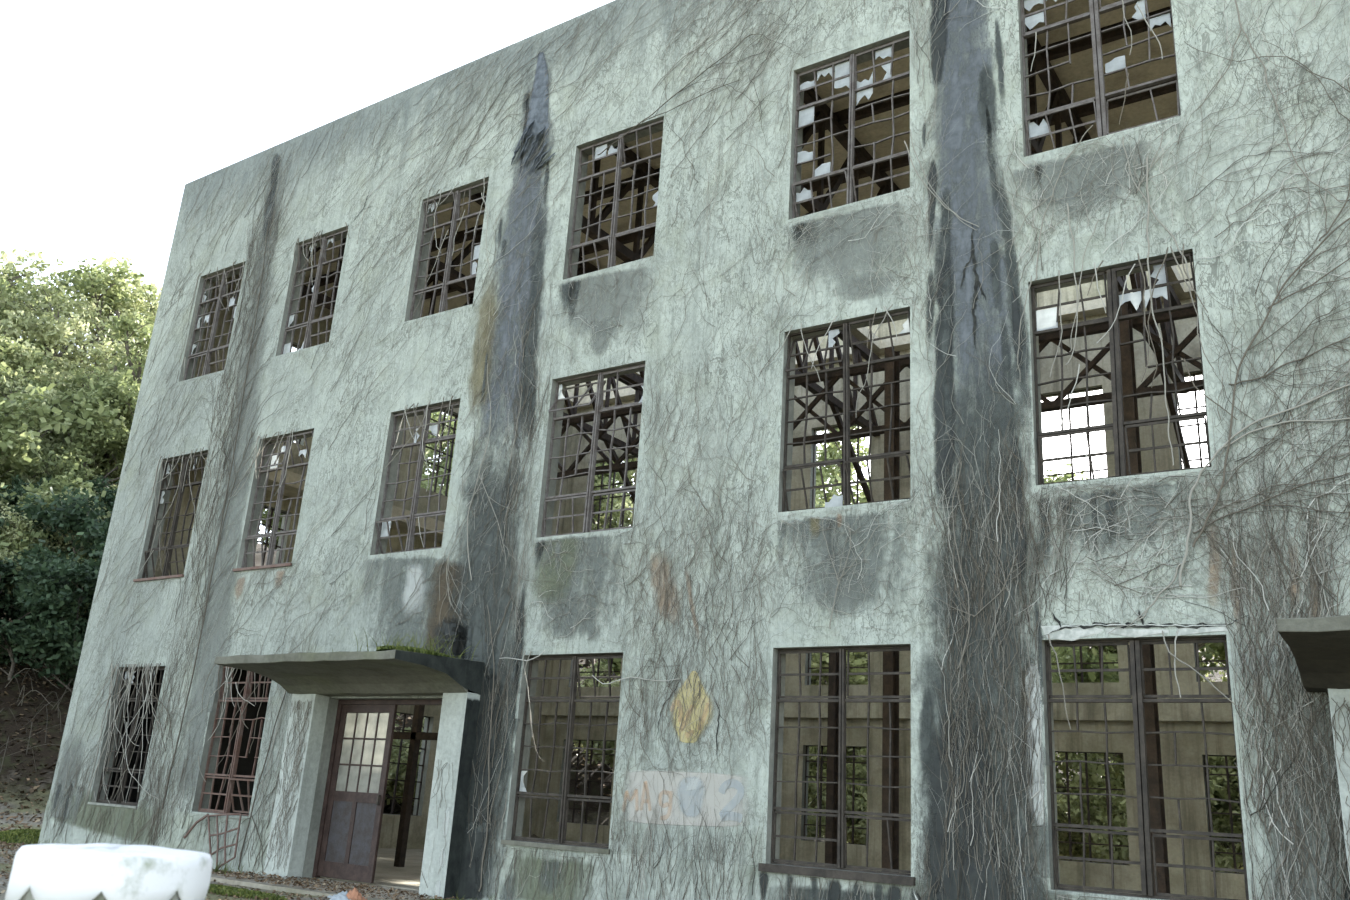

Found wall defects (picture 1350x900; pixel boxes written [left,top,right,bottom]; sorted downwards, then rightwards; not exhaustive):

damp [471,89,550,436]
damp [779,0,1182,900]
damp [366,458,619,900]
damp [759,872,768,899]